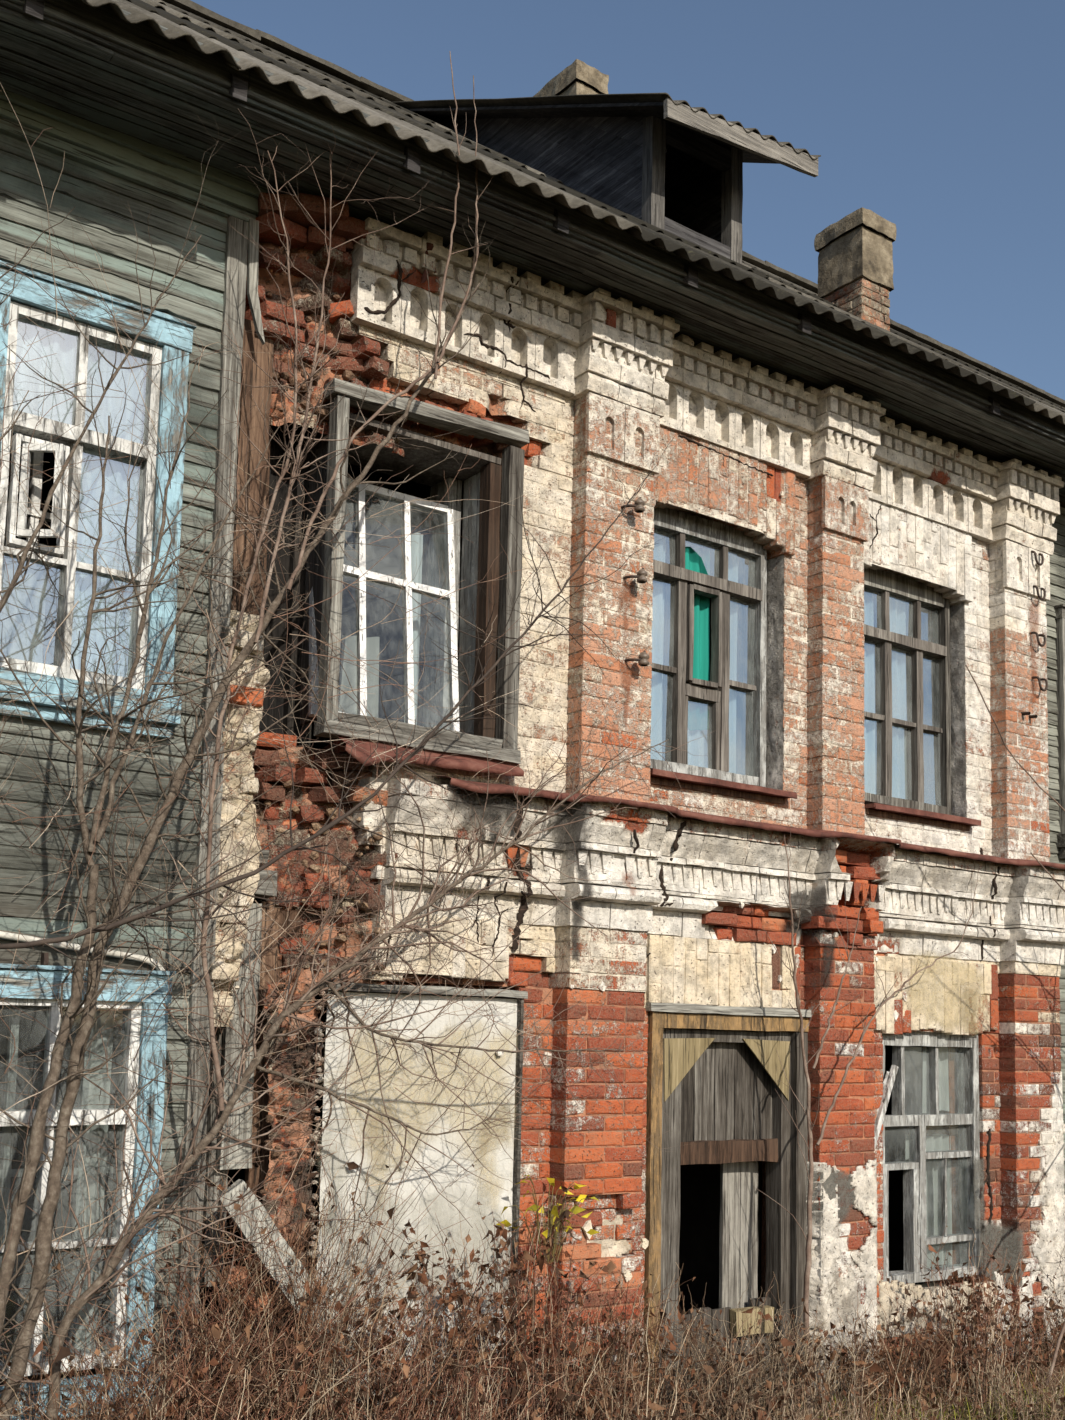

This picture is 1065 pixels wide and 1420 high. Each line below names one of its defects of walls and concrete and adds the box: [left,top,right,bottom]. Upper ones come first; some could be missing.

spalling [245,192,516,435]
crack [364,242,441,315]
crack [464,276,550,412]
spalling [349,406,542,466]
crack [469,794,533,959]
crack [624,821,692,958]
peeling [210,610,649,1367]
peeling [701,849,1065,1385]